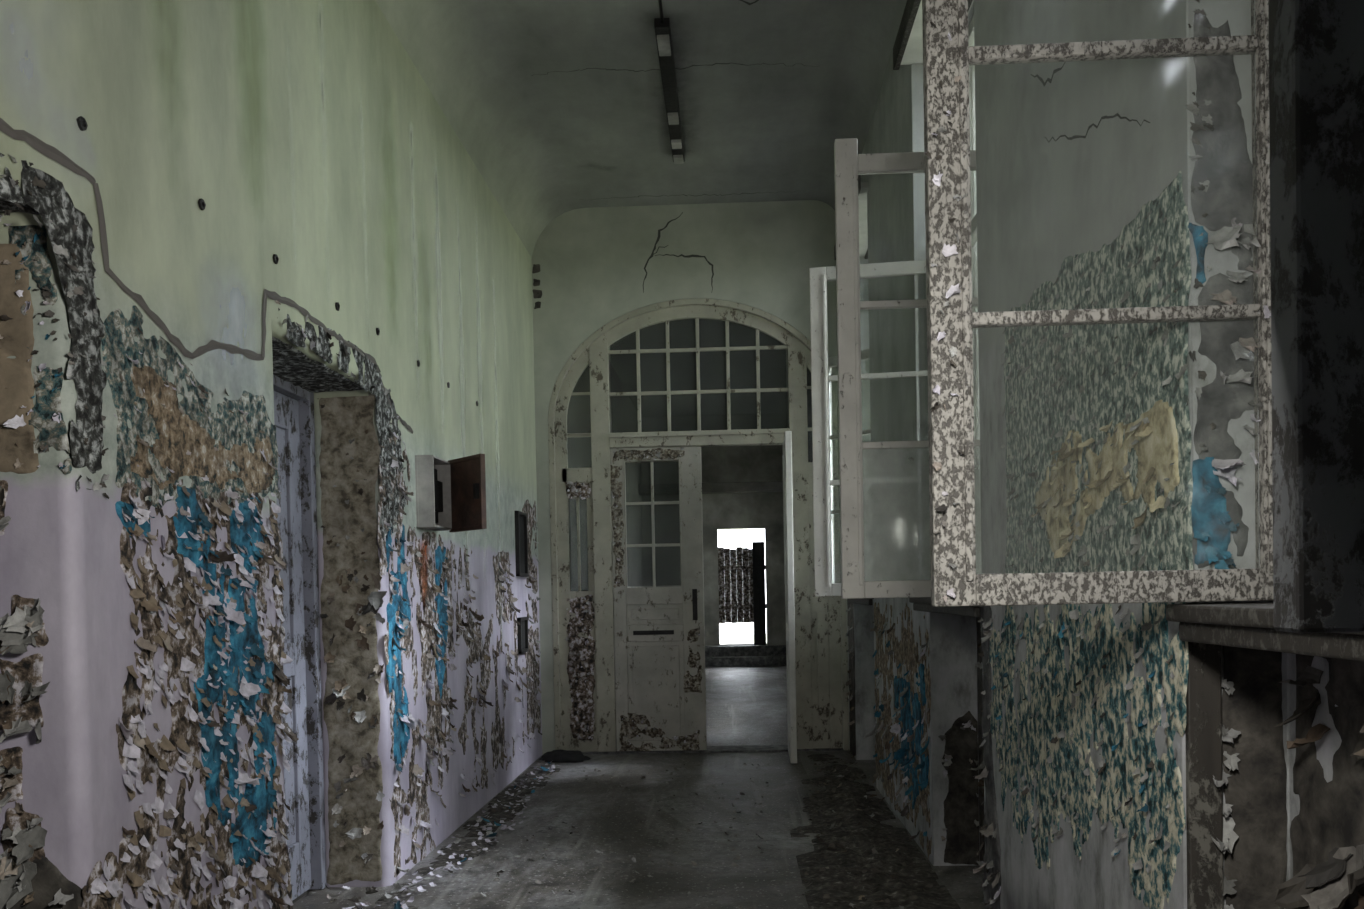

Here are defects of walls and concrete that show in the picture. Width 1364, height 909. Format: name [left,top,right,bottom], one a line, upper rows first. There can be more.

peeling [1188,0,1231,37]
peeling [925,110,952,186]
crack [594,191,795,293]
peeling [931,217,959,267]
peeling [936,332,957,368]
peeling [1001,55,1271,573]
peeling [0,153,298,909]
peeling [272,300,542,885]
peeling [610,447,685,588]
peeling [564,594,595,742]
peeling [845,602,1189,909]
peeling [1210,646,1364,909]